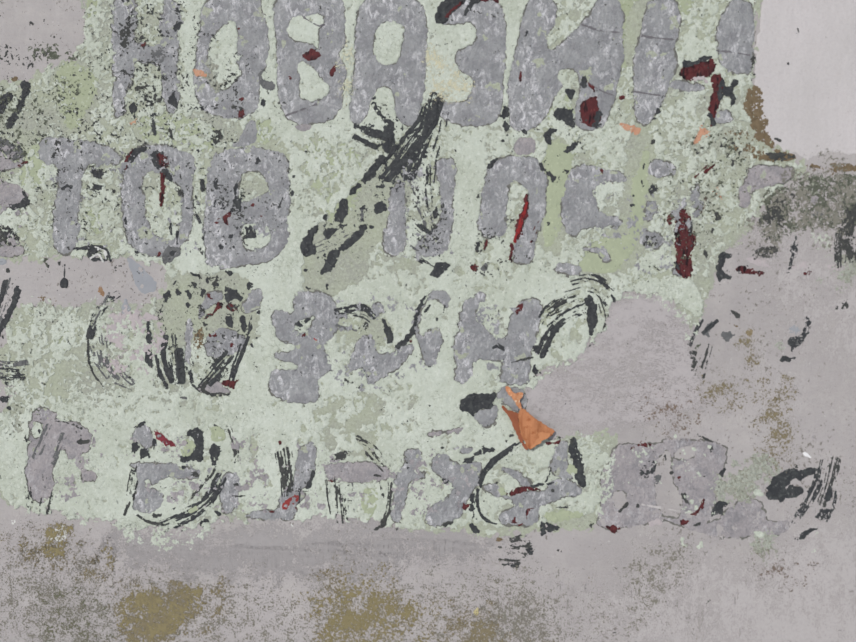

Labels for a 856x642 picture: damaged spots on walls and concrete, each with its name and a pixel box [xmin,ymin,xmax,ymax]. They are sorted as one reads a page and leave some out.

peeling [281,8,330,104]
peeling [373,6,405,65]
peeling [537,0,597,50]
peeling [735,246,776,277]
peeling [787,236,812,275]
peeling [689,343,712,376]
peeling [701,319,719,337]
peeling [721,310,741,342]
peeling [775,316,811,362]
water stain [0,148,856,642]
peeling [32,422,52,459]
peeling [630,441,844,541]